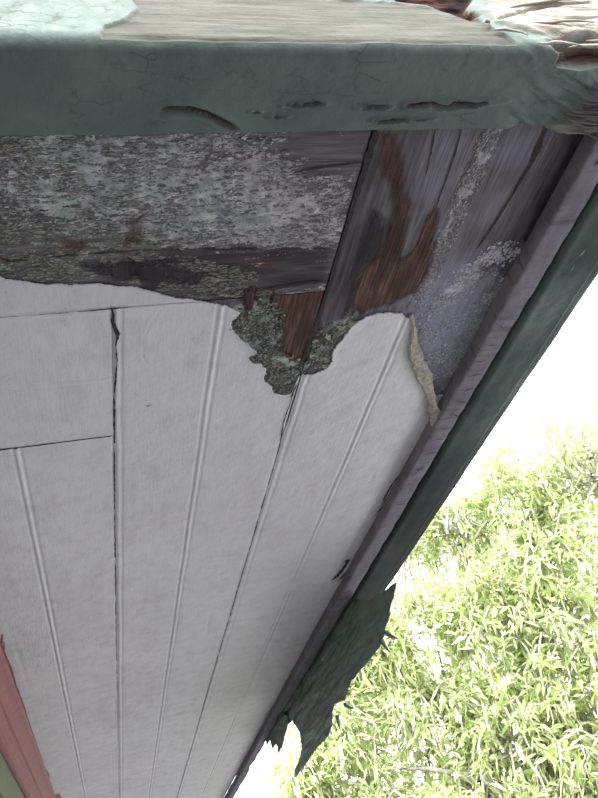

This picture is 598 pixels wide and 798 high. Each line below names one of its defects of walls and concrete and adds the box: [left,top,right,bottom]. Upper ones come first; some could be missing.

peeling [101,0,517,46]
crack [0,249,180,262]
leakage [79,260,204,285]
leakage [243,287,257,311]
peeling [0,124,576,427]
crack [0,305,130,628]
crack [178,130,378,793]
peeling [266,583,398,778]